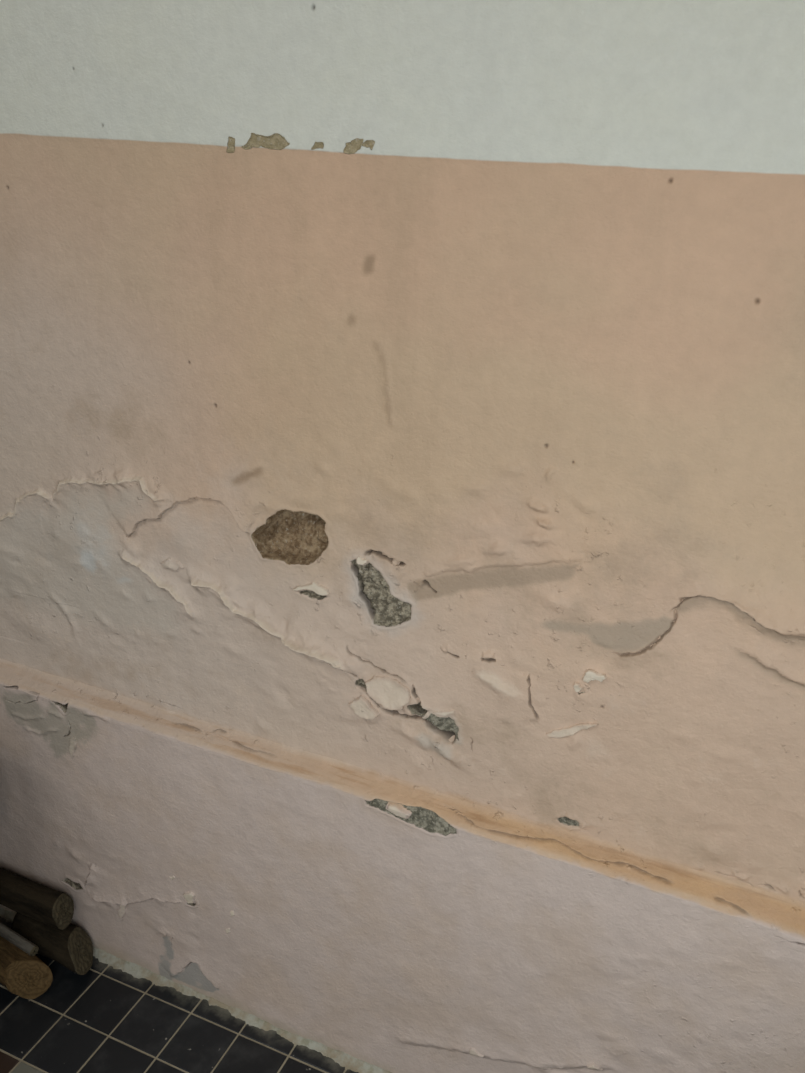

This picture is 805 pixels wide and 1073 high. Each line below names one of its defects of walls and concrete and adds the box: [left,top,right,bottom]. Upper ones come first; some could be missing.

peeling [222,126,382,161]
flaking render [119,497,506,776]
flaking render [0,668,109,773]
flaking render [356,783,465,841]
damp [151,926,226,998]